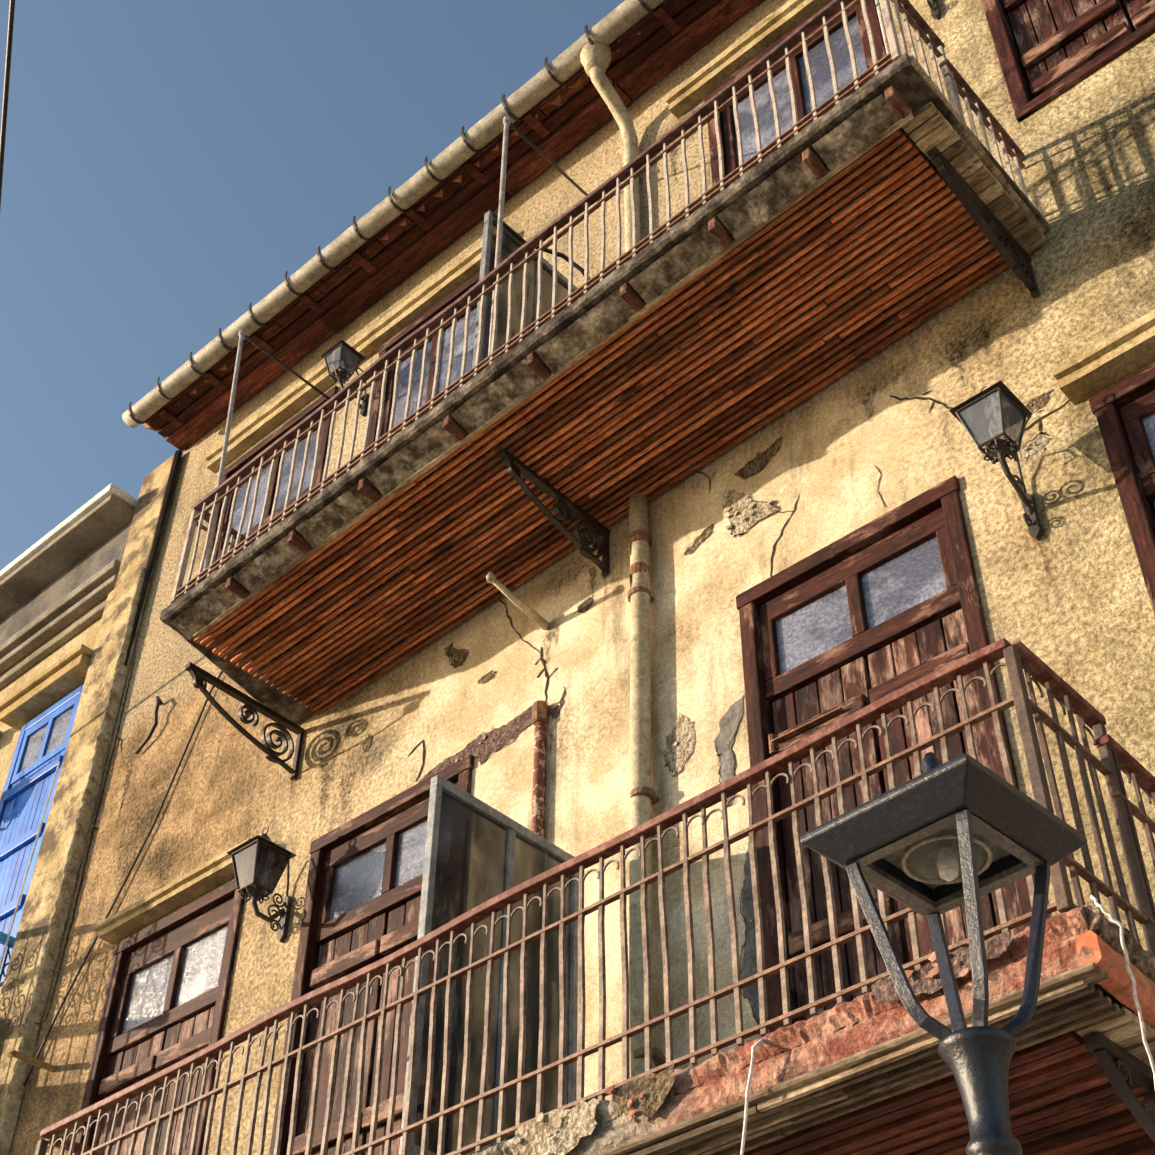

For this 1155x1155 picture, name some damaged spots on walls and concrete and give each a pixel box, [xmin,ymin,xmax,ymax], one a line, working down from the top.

crack [890,390,952,413]
spalling [684,434,783,556]
crack [770,493,800,577]
spalling [444,642,469,668]
crack [498,598,557,701]
peeling [418,705,533,783]
peeling [549,686,566,719]
spalling [663,713,696,777]
peeling [714,695,744,783]
spalling [904,940,971,995]
spalling [985,930,1012,959]
spalling [513,1063,675,1155]